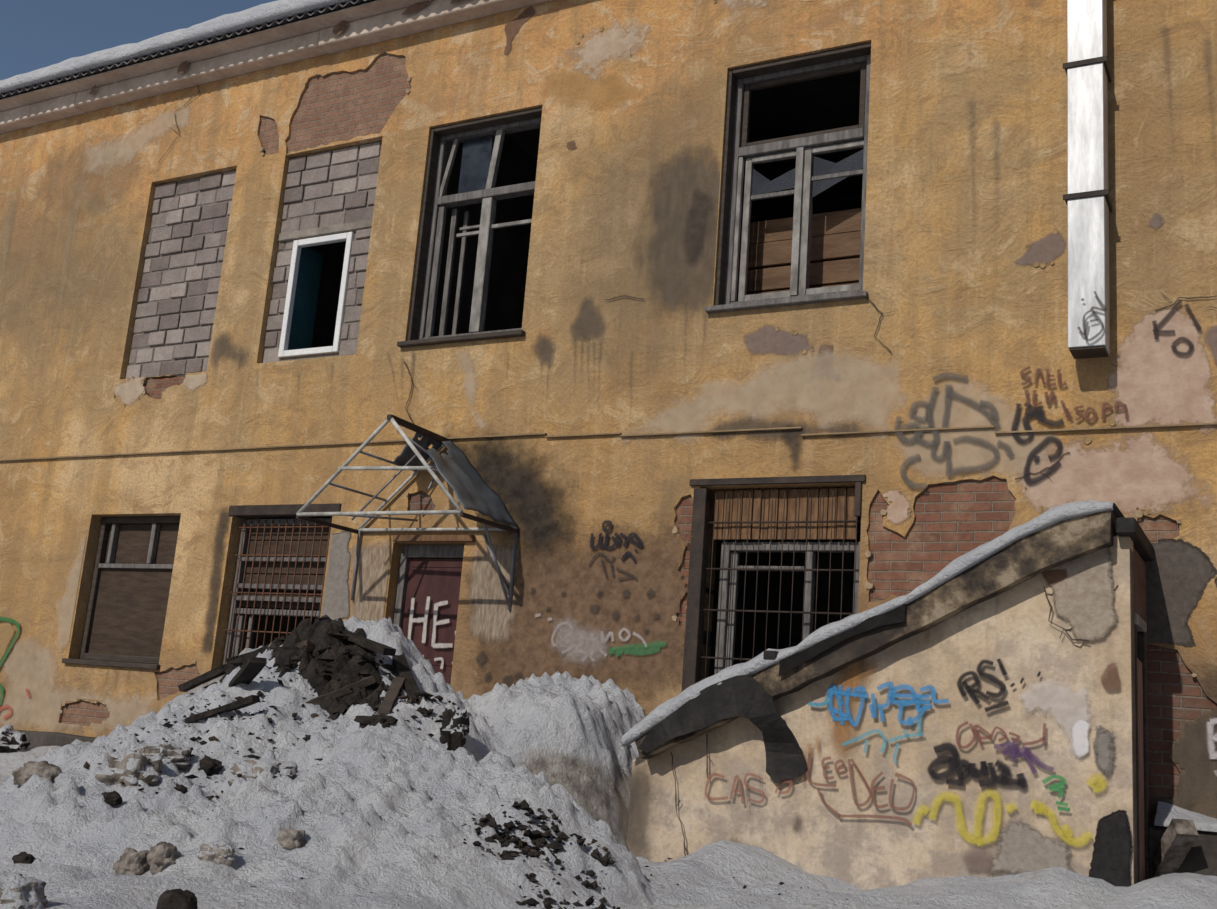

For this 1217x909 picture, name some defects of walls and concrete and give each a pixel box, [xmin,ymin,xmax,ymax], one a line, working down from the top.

peeling [575,24,648,79]
flaking render [259,53,412,158]
water stain [650,157,720,309]
flaking render [113,374,207,406]
water stain [536,337,552,361]
water stain [573,301,602,339]
flaking render [865,308,1217,602]
flaking render [1042,547,1118,647]
flaking render [1147,644,1217,802]